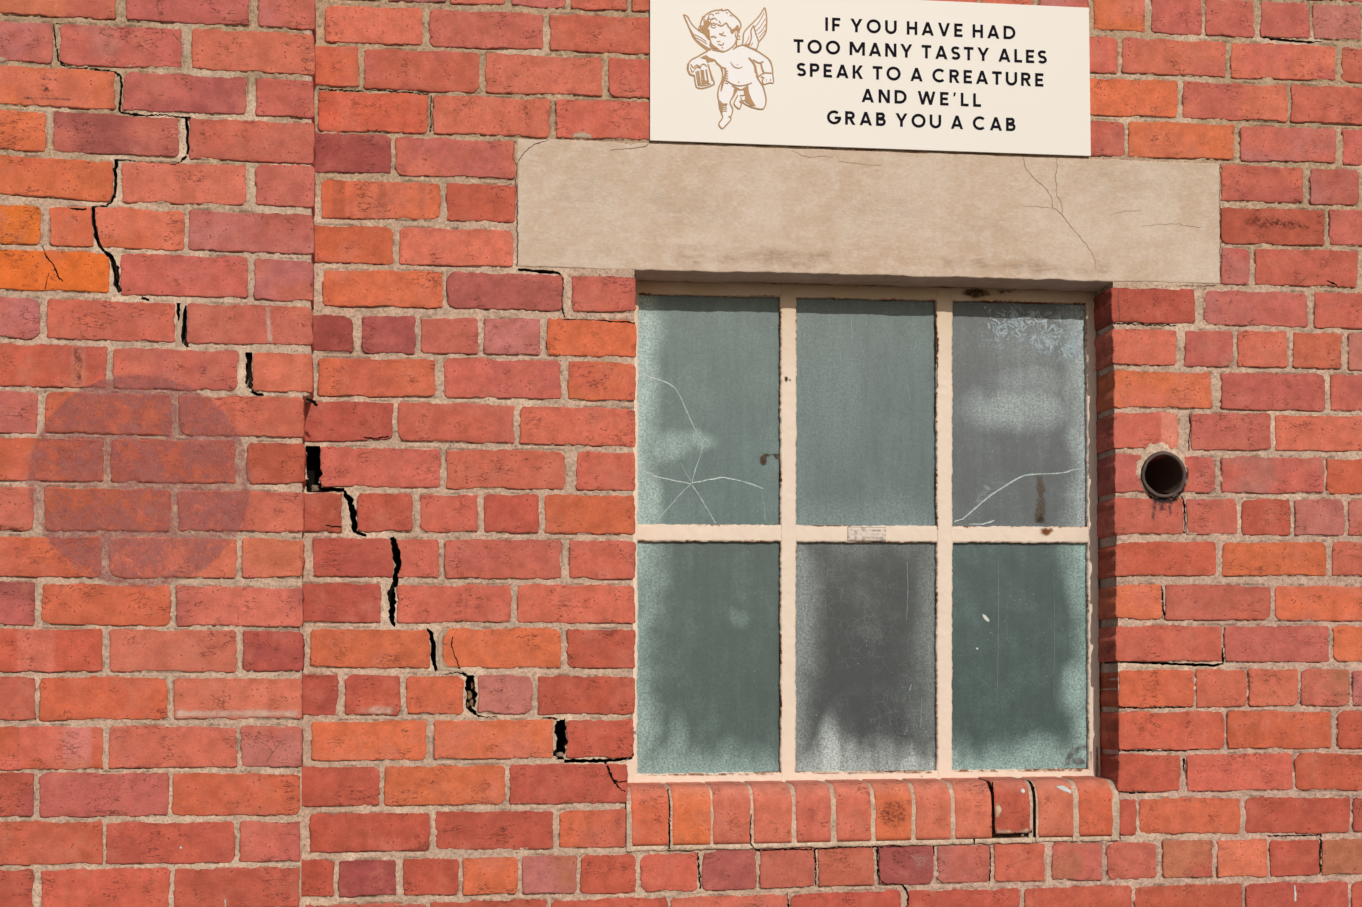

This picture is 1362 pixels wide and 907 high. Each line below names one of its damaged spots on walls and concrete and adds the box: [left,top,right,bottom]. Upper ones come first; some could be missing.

crack [53,23,191,344]
crack [319,88,432,132]
crack [509,140,635,324]
crack [245,352,264,396]
crack [305,446,496,718]
crack [542,717,634,792]